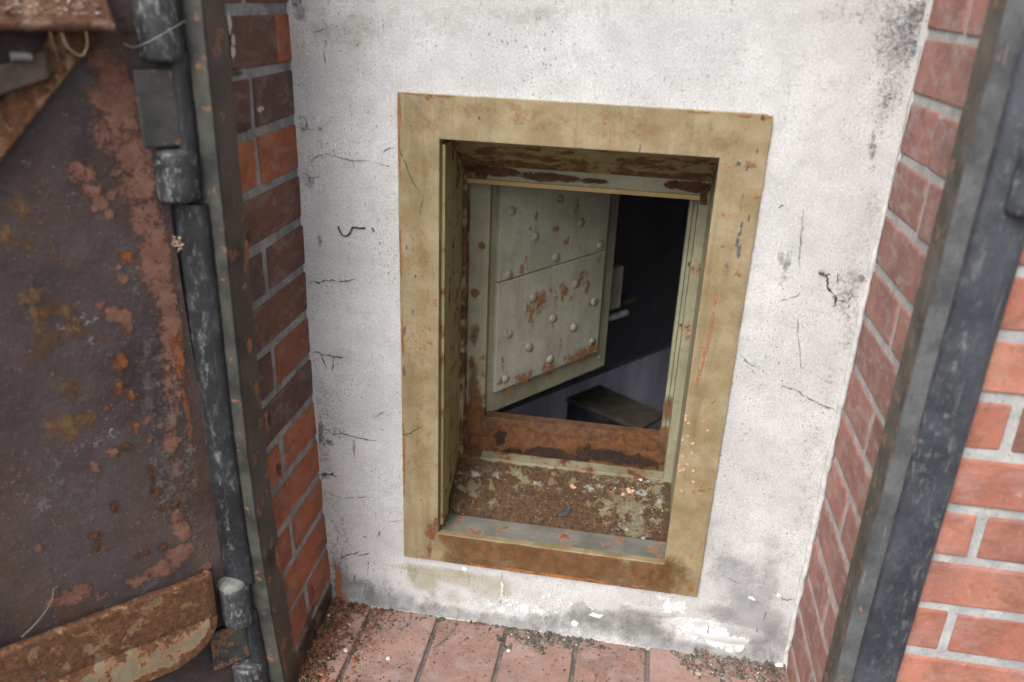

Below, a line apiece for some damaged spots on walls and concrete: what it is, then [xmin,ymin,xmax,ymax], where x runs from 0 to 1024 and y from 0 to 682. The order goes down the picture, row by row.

leakage [876,1,926,70]
corrosion [468,165,607,184]
corrosion [663,180,711,205]
crack [819,271,853,307]
crack [324,412,423,442]
corrosion [466,358,672,469]
crack [318,473,401,581]
leakage [333,565,725,658]